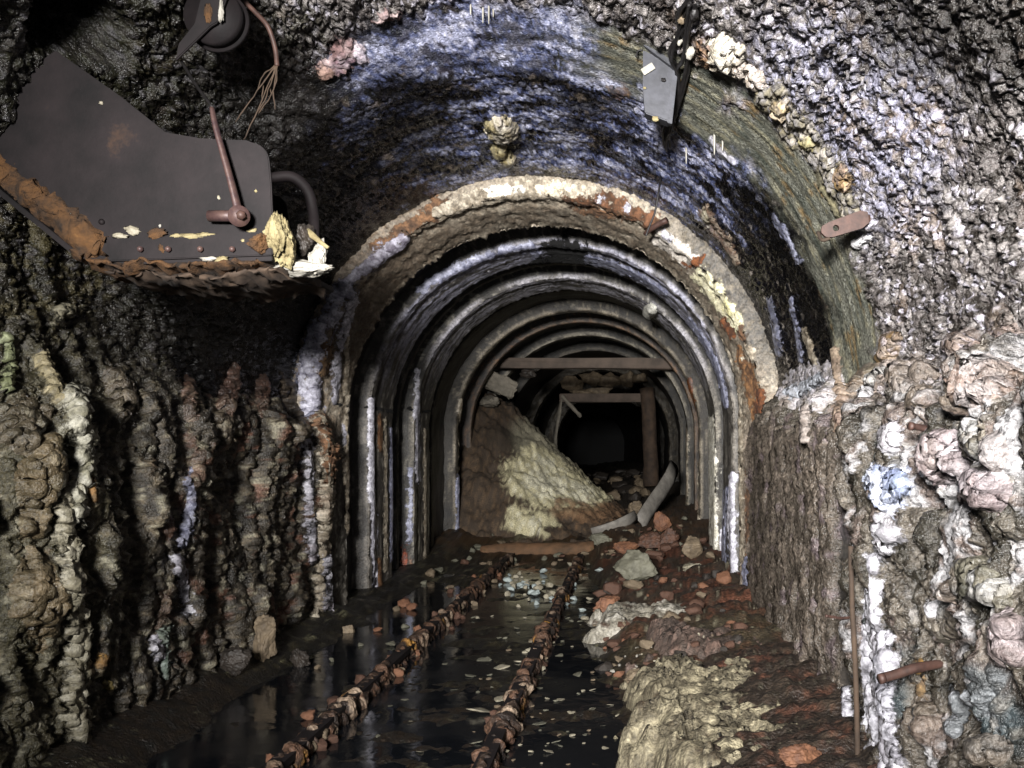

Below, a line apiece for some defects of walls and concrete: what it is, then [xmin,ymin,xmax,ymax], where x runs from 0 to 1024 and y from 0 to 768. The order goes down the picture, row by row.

water stain [708,136,736,166]
water stain [753,78,860,218]
corrosion [561,188,669,235]
water stain [609,259,668,297]
corrosion [681,254,706,271]
water stain [697,203,740,267]
water stain [772,213,804,265]
corrosion [718,316,766,421]
water stain [765,294,851,444]
water stain [299,330,351,617]